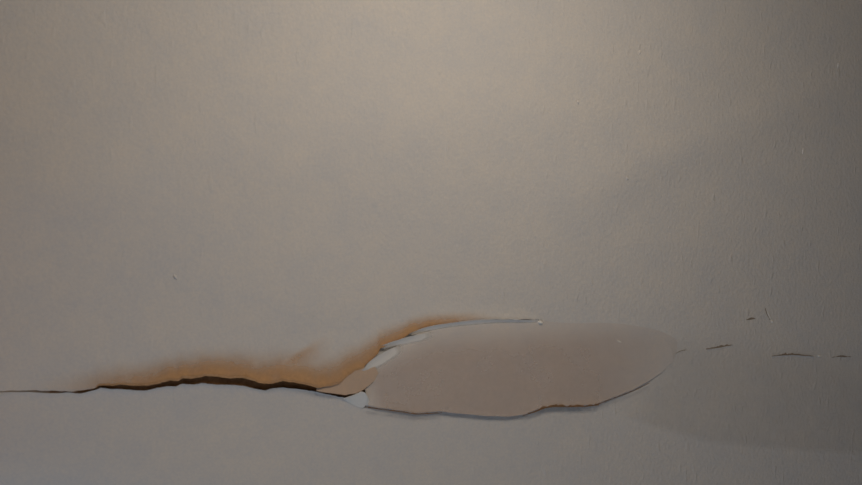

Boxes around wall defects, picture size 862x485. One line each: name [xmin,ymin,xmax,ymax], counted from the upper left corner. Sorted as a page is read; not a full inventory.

water stain [130,320,456,388]
peeling [316,319,677,417]
crack [772,353,851,361]
crack [0,376,390,431]